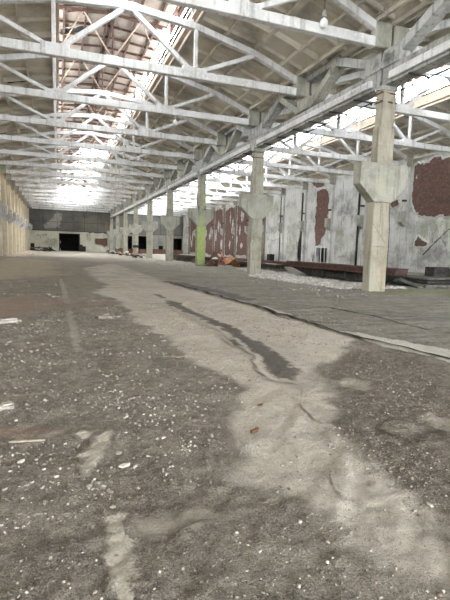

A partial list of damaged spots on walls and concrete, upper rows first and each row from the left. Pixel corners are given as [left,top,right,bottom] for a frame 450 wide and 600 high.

spalling [410,154,450,219]
spalling [94,238,109,248]
spalling [205,204,253,269]
spalling [311,182,330,262]
spalling [413,234,429,248]
damp [150,294,313,384]